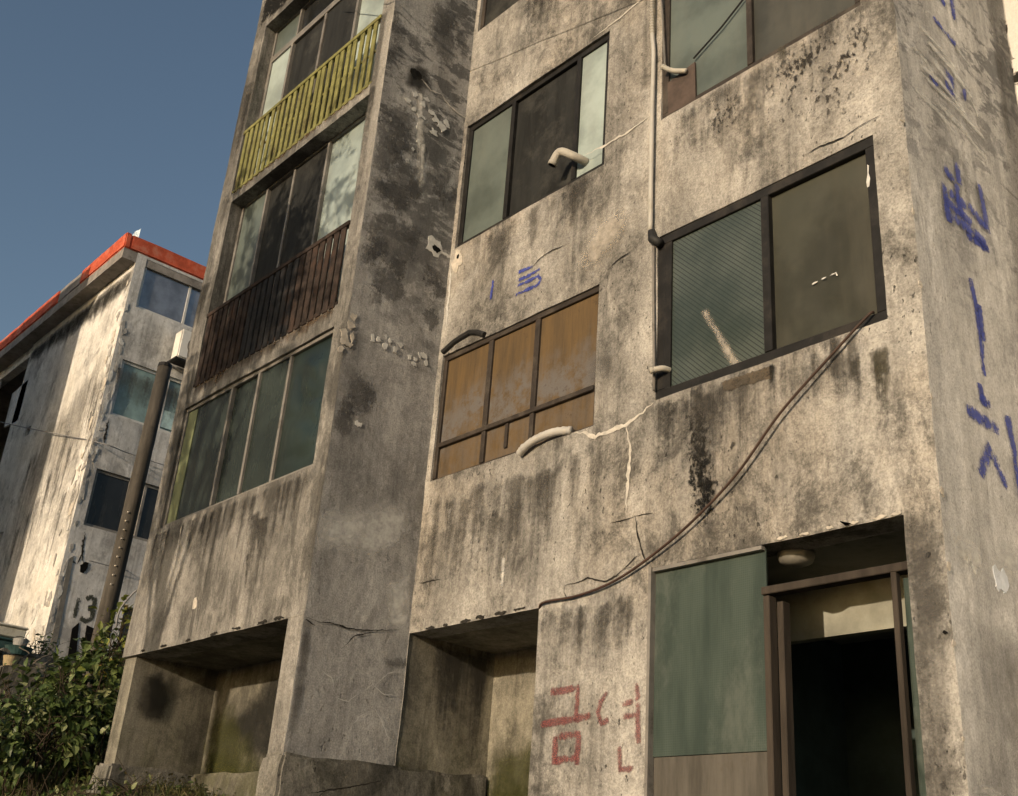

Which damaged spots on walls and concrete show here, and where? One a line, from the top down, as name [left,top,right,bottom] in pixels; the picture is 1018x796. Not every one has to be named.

damp [417,93,425,184]
spalling [399,91,450,163]
peeling [425,235,443,257]
peeling [451,249,463,273]
damp [442,252,451,330]
spalling [338,313,357,352]
spalling [371,334,428,367]
damp [684,384,718,521]
crack [564,403,653,596]
crack [73,532,89,573]
crack [306,617,388,649]